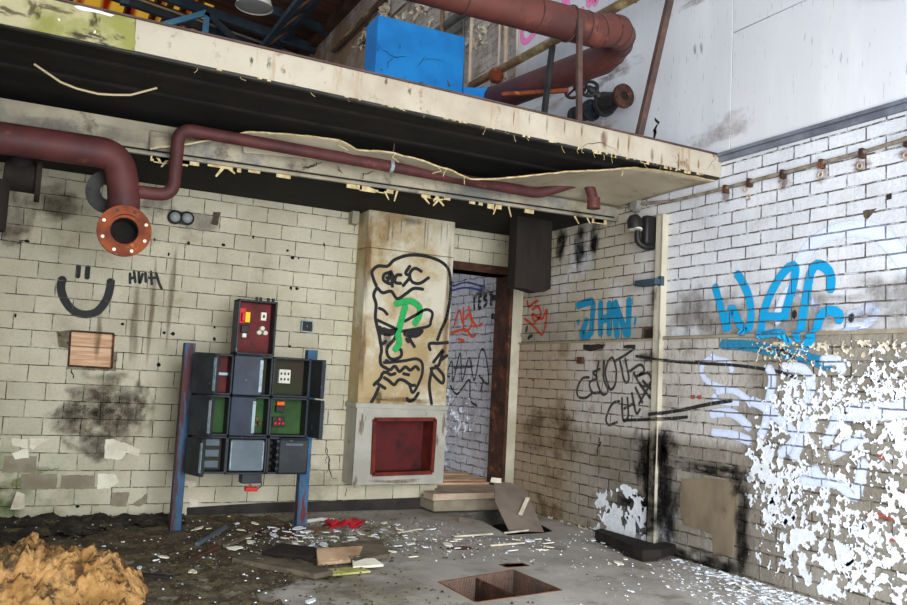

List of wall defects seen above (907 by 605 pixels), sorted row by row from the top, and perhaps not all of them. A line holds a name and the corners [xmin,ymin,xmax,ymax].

peeling [378,0,435,27]
water stain [61,397,145,459]
peeling [444,389,476,465]
water stain [635,431,676,480]
peeling [659,339,907,605]
peeling [548,484,647,541]
water stain [611,467,748,574]